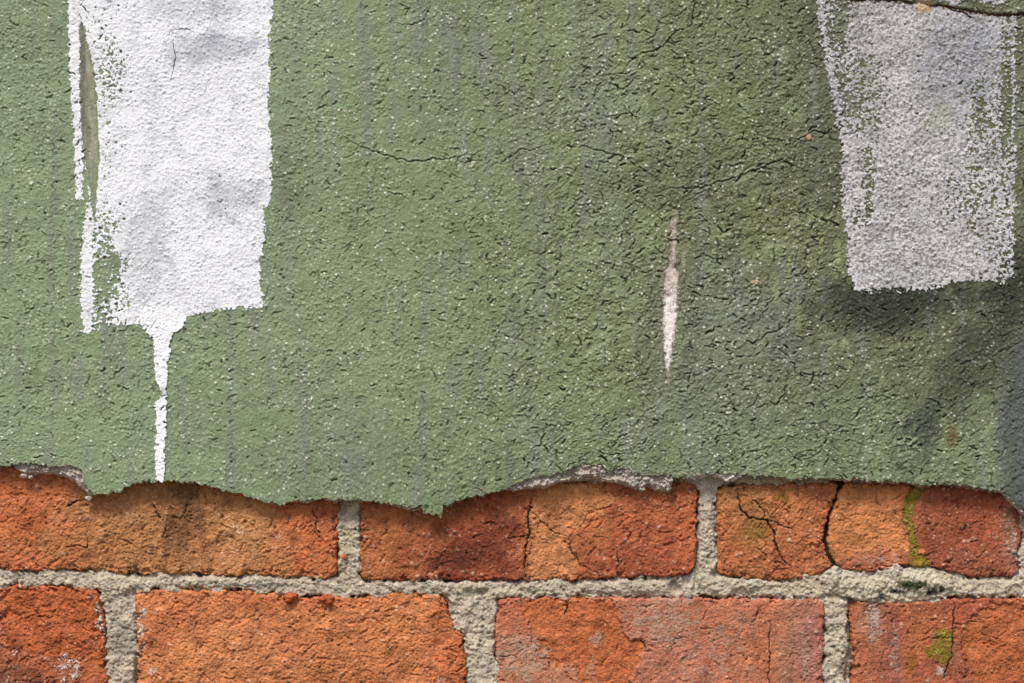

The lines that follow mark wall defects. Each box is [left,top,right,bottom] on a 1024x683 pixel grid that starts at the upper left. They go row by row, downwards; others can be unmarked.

crack [333,131,481,162]
spalling [14,463,94,501]
peeling [388,503,443,519]
crack [508,494,613,576]
spalling [506,463,742,580]
crack [737,488,792,568]
crack [822,480,844,569]
spalling [827,435,985,561]
spalling [2,584,105,663]
spalling [521,596,645,683]